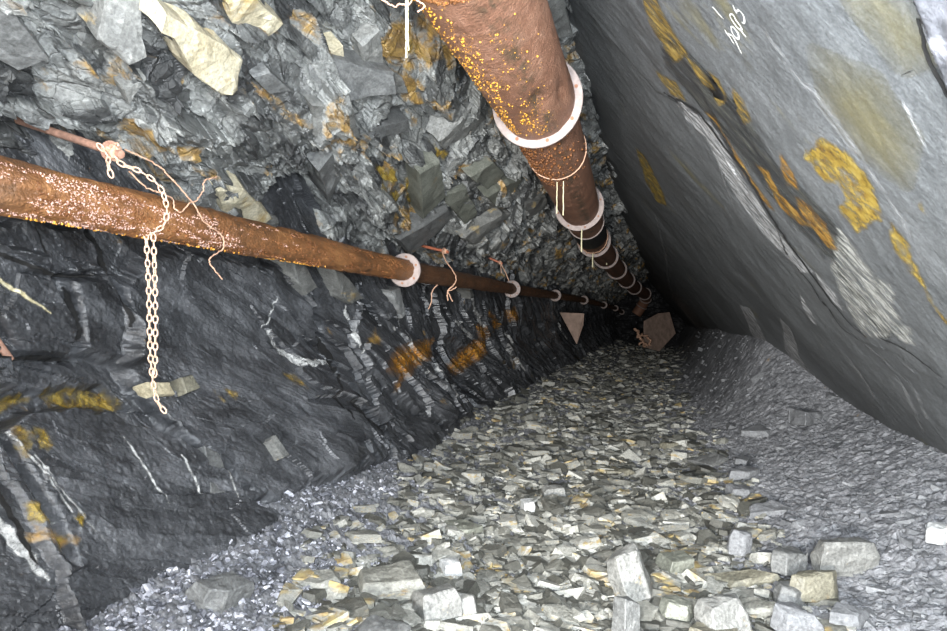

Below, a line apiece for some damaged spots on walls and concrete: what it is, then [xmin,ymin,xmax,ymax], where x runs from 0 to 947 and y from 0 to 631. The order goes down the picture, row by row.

rust [377,166,410,203]